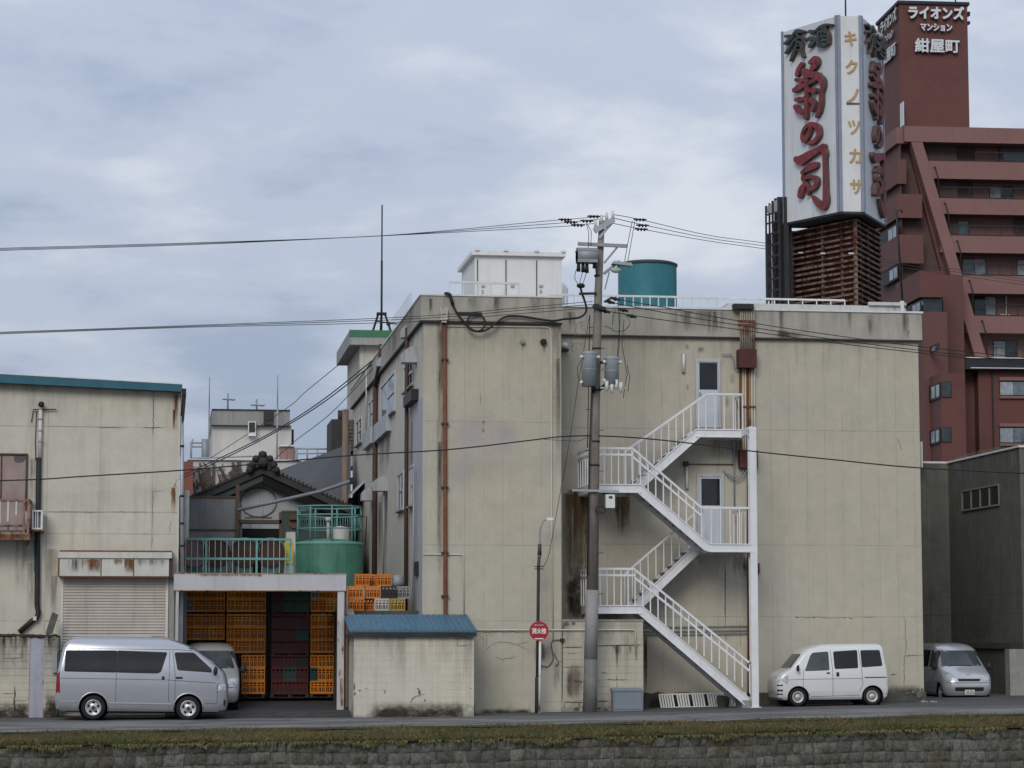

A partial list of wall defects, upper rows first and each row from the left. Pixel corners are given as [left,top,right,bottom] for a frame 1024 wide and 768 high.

crack [457,631,525,662]